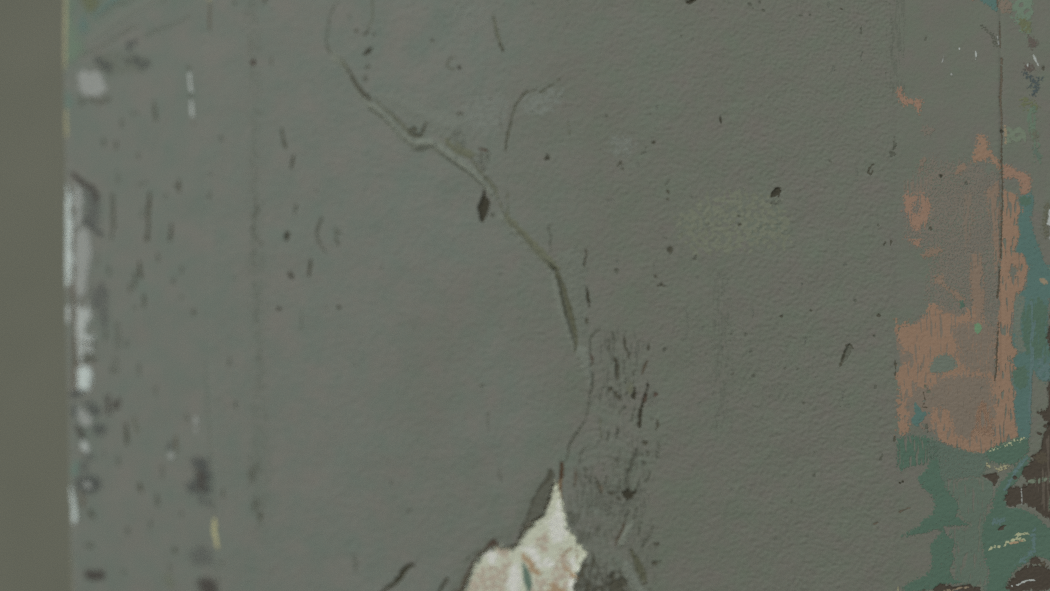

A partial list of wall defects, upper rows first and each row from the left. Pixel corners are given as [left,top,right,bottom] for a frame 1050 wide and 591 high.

crack [325,1,603,529]
spalling [599,332,660,430]
spalling [459,470,604,591]
spalling [583,441,661,586]